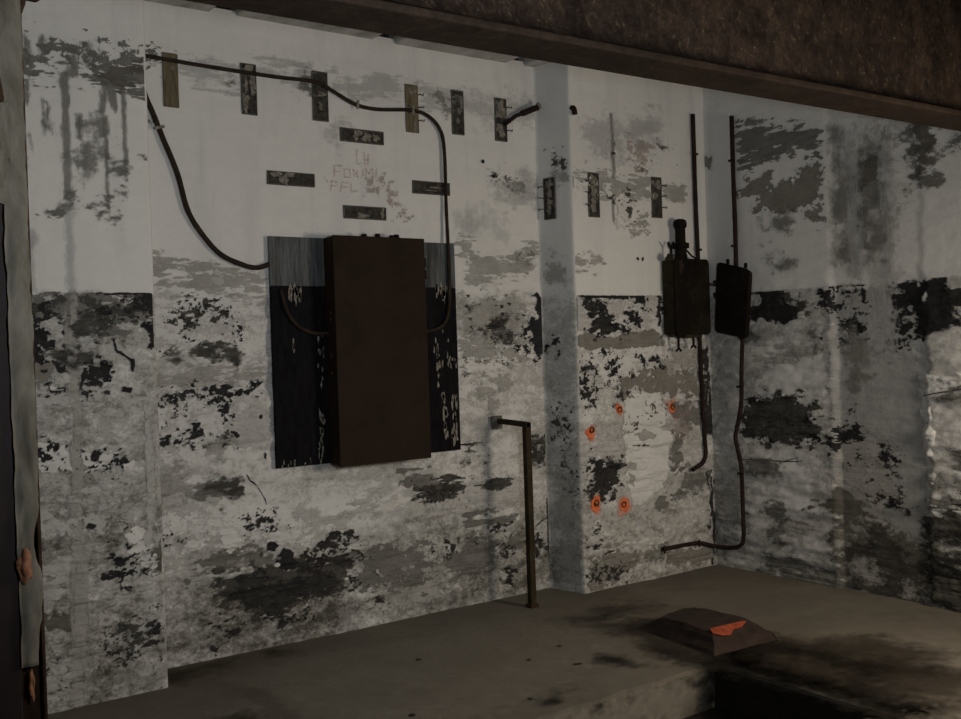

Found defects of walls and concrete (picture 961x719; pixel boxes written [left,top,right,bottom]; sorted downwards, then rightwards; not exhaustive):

leakage [23,22,162,224]
peeling [543,146,688,239]
peeling [734,117,827,233]
leakage [832,134,888,262]
peeling [893,123,961,192]
leakage [42,291,165,708]
peeling [32,250,268,461]
spalling [140,534,162,576]
peeling [433,233,607,447]
spalling [577,295,715,511]
spalling [585,522,715,591]
peeling [750,277,961,526]